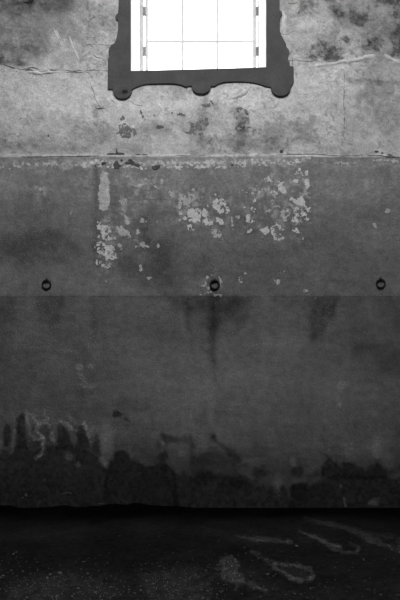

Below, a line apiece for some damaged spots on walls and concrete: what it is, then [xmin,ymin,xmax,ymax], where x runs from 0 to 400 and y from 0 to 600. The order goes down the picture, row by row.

crack [3,15,114,110]
spalling [116,115,137,139]
peeling [0,149,311,269]
damp [0,414,400,508]